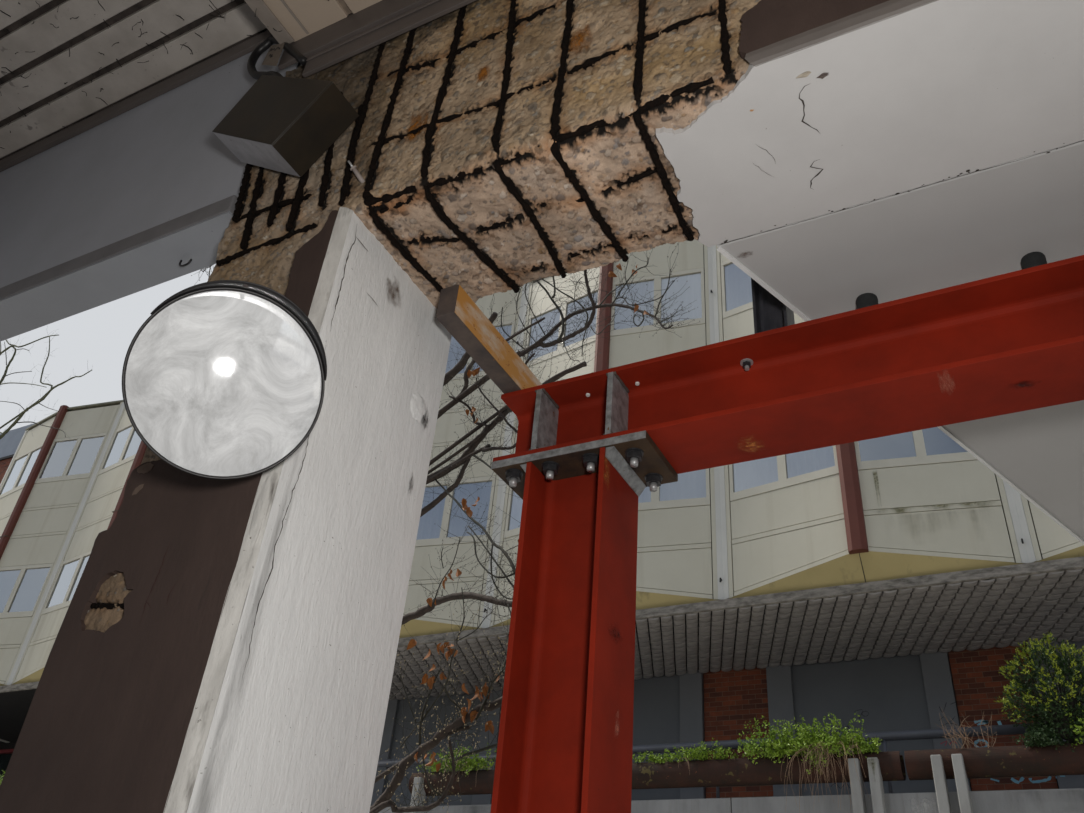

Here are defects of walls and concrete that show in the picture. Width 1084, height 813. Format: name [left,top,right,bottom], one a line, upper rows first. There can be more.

crack [799,83,819,132]
spalling [207,0,761,308]
crack [720,140,1084,245]
spalling [141,447,161,464]
spalling [84,573,132,633]